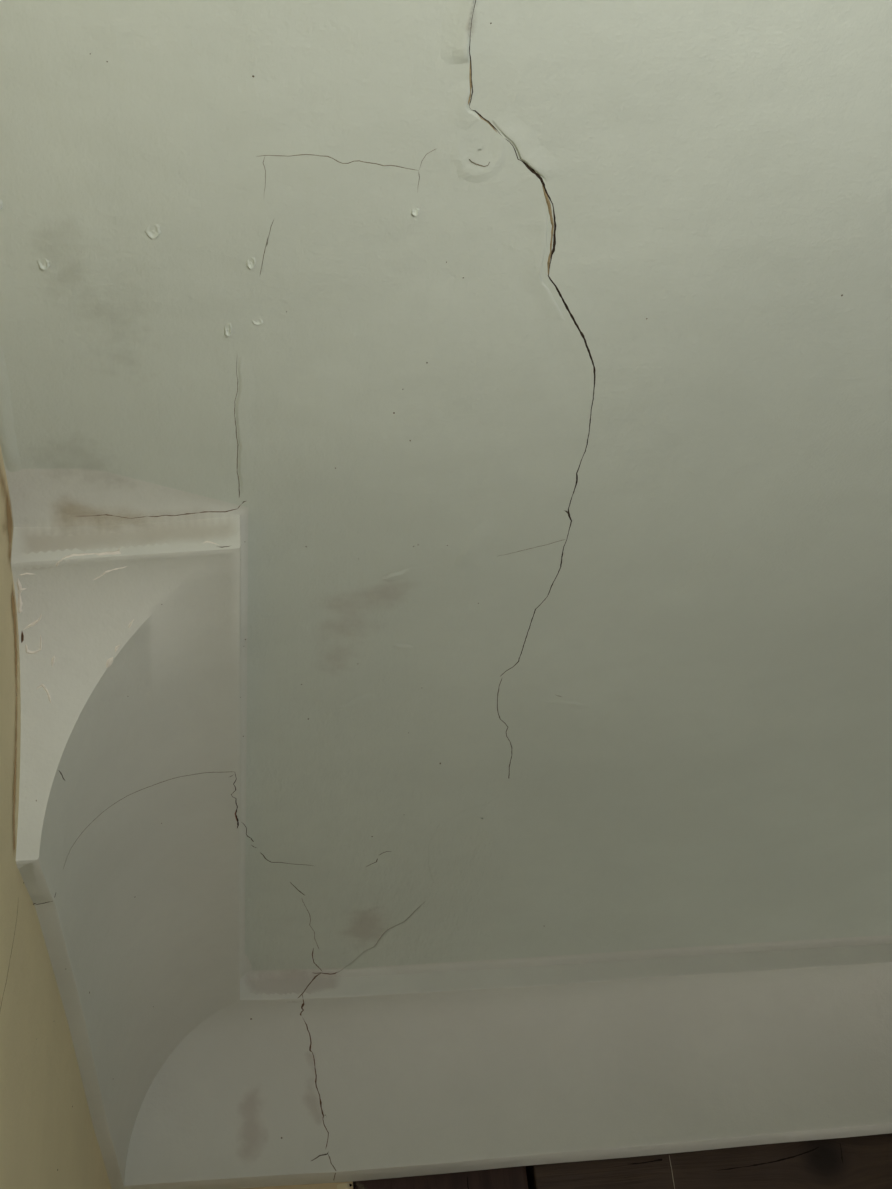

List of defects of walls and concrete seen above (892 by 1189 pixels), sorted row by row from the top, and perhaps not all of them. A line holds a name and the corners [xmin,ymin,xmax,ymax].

crack [256,149,435,185]
crack [441,0,596,778]
crack [0,771,337,1180]